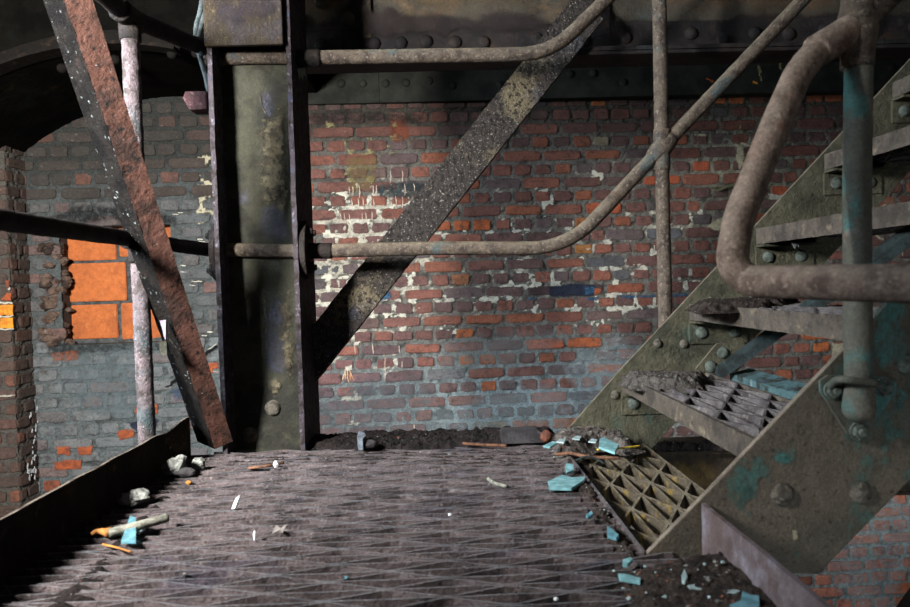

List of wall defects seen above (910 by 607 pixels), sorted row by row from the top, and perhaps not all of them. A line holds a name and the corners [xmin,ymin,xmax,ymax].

efflorescence [314,262,349,307]
efflorescence [368,299,417,331]
water stain [433,258,561,314]
water stain [565,257,658,327]
efflorescence [324,384,436,434]